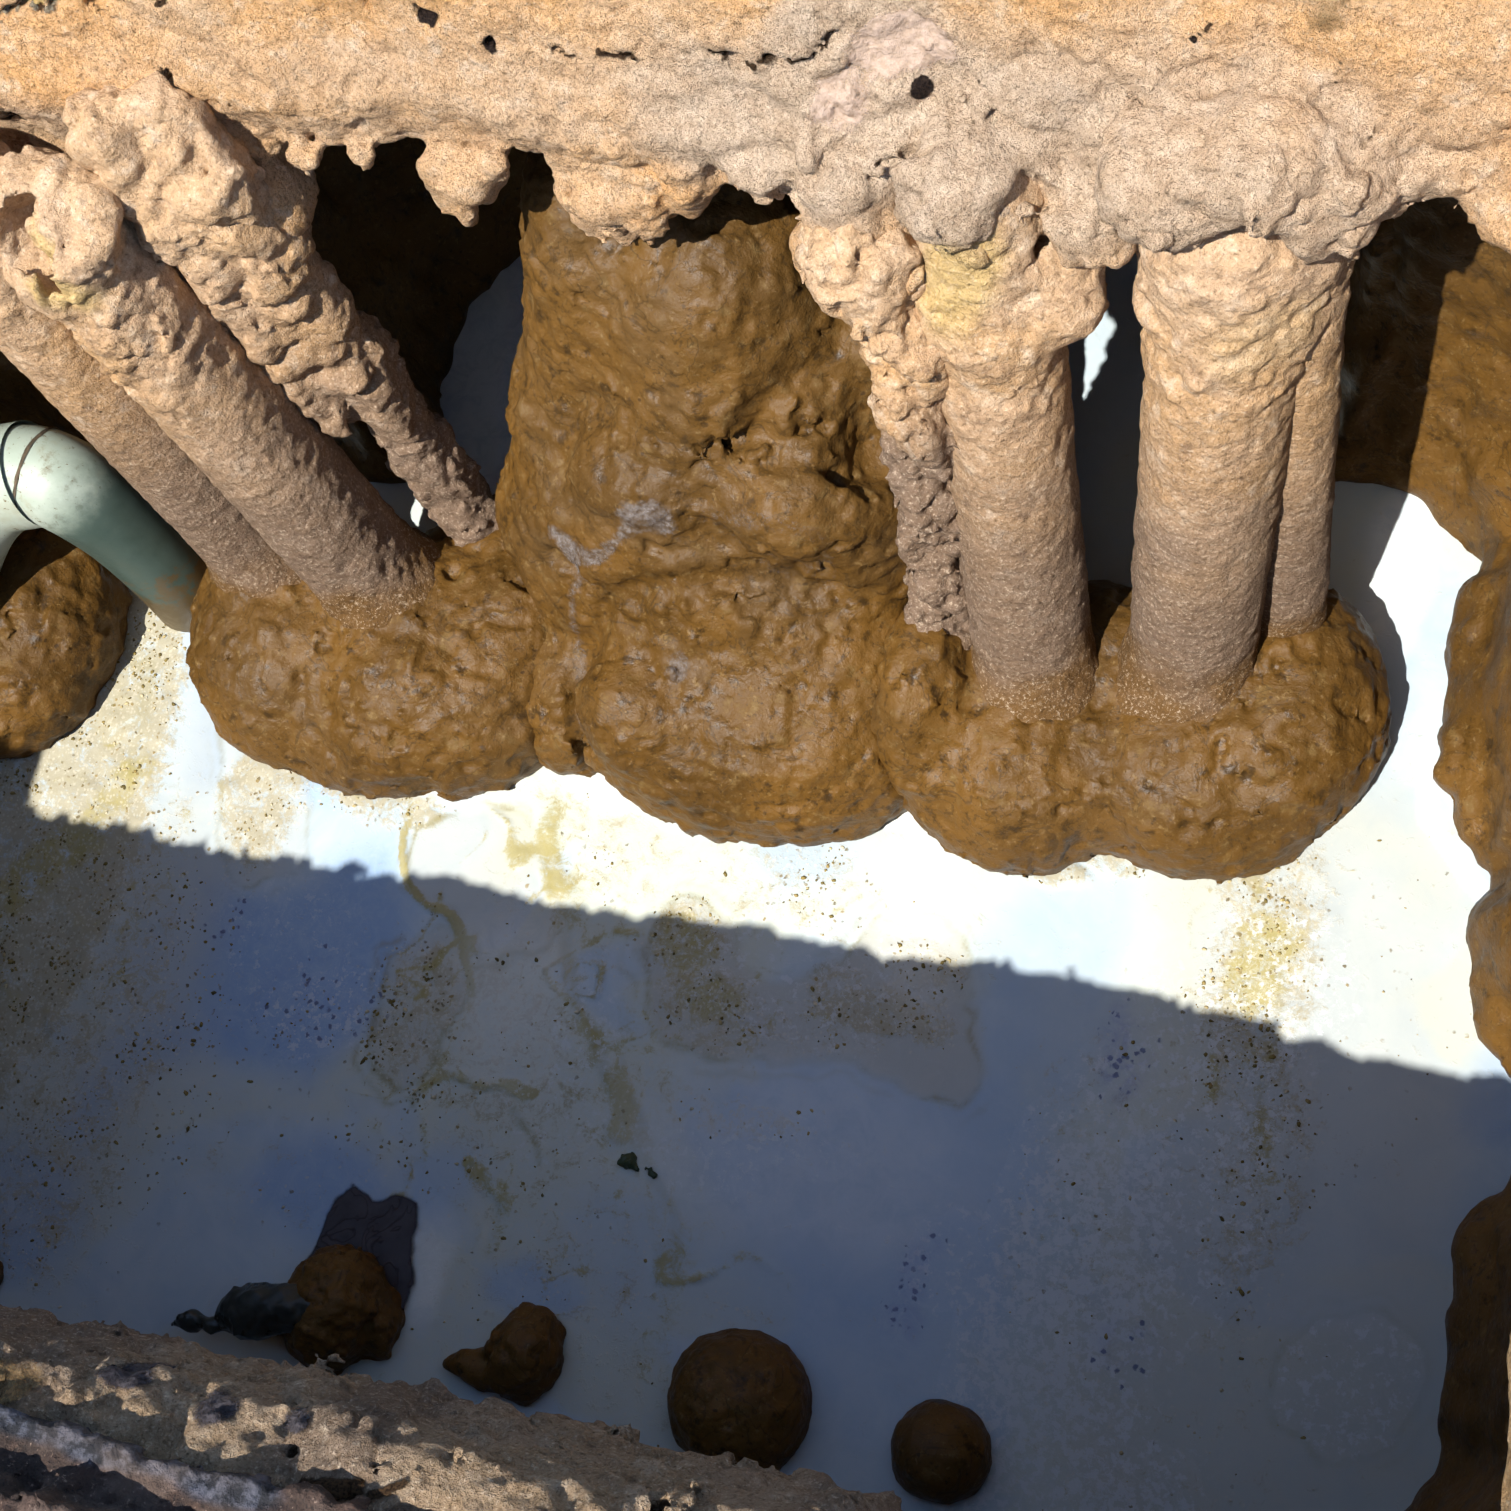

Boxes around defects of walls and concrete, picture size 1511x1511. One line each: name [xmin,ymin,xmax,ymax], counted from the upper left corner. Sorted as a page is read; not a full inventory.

crack [0,0,166,23]